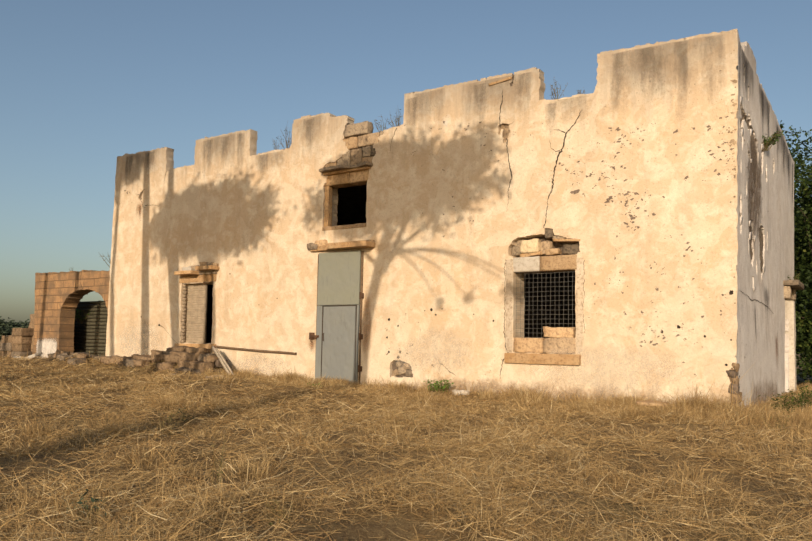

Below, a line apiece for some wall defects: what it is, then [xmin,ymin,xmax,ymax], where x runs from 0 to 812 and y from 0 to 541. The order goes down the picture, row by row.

crack [499,91,512,210]
crack [543,113,580,228]
water stain [748,142,761,244]
spalling [386,336,413,377]
hole [639,323,707,348]
spalling [724,357,746,408]